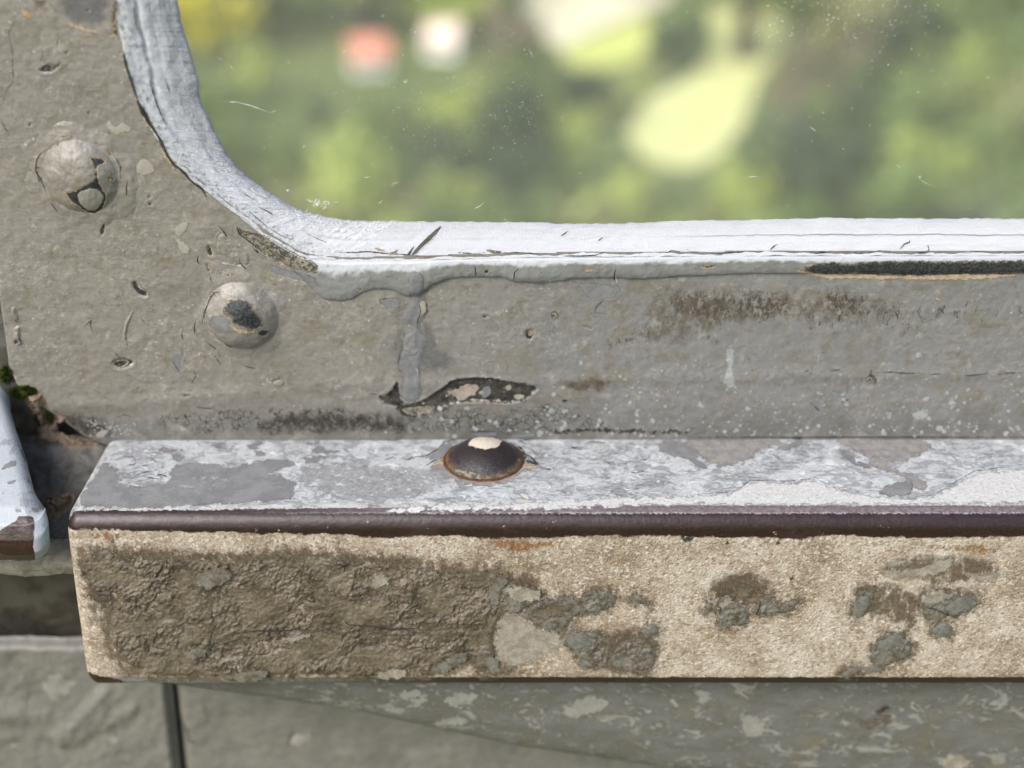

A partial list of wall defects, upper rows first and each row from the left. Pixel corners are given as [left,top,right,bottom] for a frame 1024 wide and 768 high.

peeling [61,148,121,236]
peeling [796,259,1024,281]
peeling [209,297,268,337]
spalling [379,377,538,418]
corrosion [430,441,538,487]
peeling [469,437,502,450]
peeling [69,440,1024,519]
peeling [75,539,662,701]
peeling [703,573,805,633]
peeling [913,586,981,641]
peeling [836,629,918,681]
peeling [433,691,479,729]